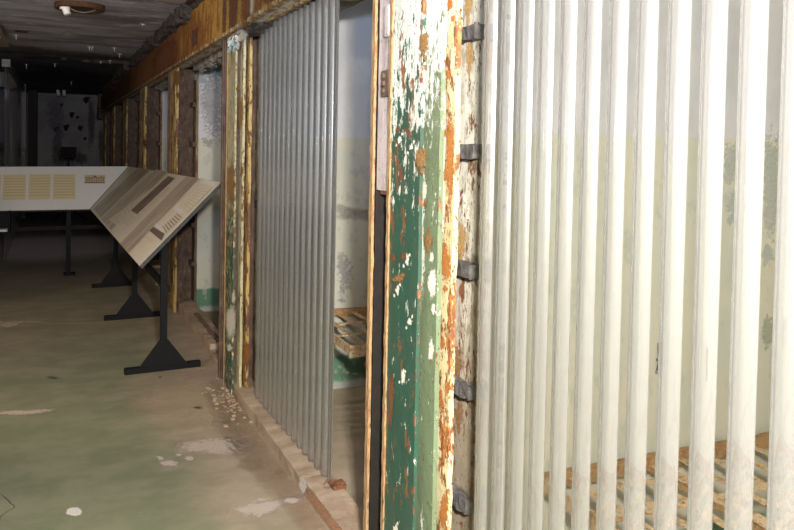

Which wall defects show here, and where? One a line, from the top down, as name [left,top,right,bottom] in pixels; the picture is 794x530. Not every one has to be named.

corrosion [222,0,274,41]
corrosion [465,0,473,26]
corrosion [236,86,244,132]
corrosion [444,107,455,213]
leakage [723,143,736,225]
leakage [762,135,779,267]
peeling [421,160,443,316]
corrosion [423,224,466,292]
peeling [225,293,236,352]
leakage [762,314,773,350]
peeling [156,437,251,466]
peeling [231,477,341,530]